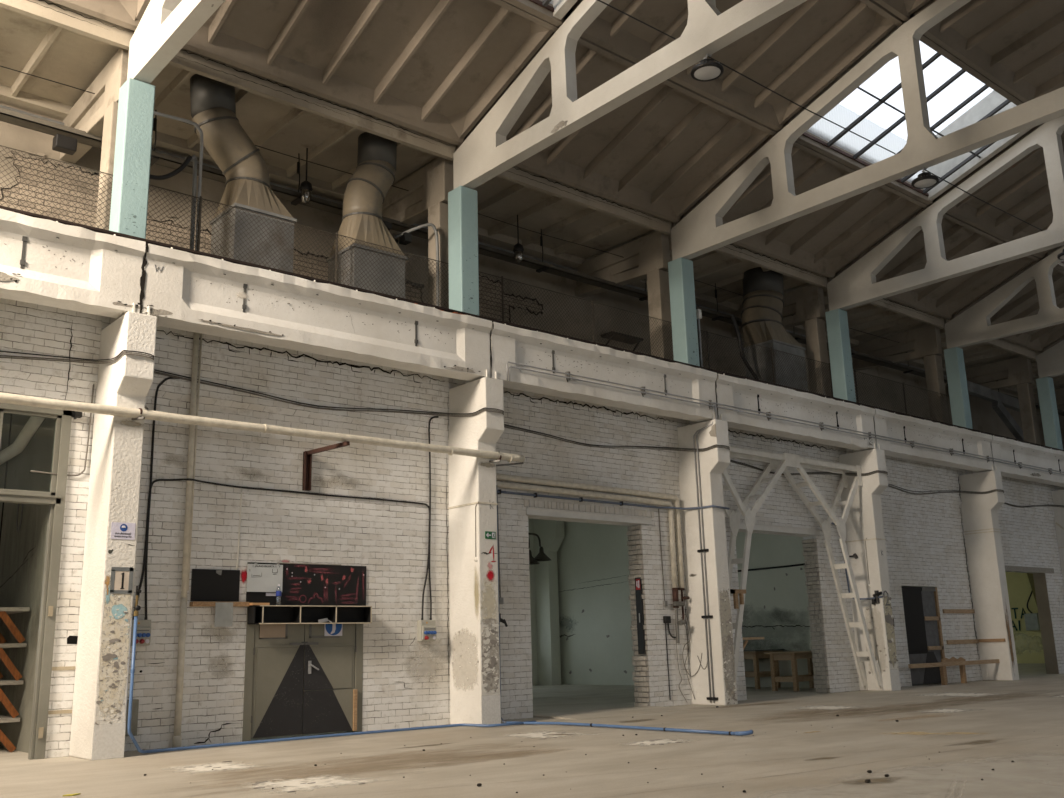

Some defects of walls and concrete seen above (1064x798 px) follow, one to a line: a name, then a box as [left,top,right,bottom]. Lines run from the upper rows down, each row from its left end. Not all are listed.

flaking render [0,150,100,227]
flaking render [464,275,543,322]
crack [133,242,449,708]
peeling [95,580,132,725]
peeling [451,618,499,693]
peeling [866,595,898,674]